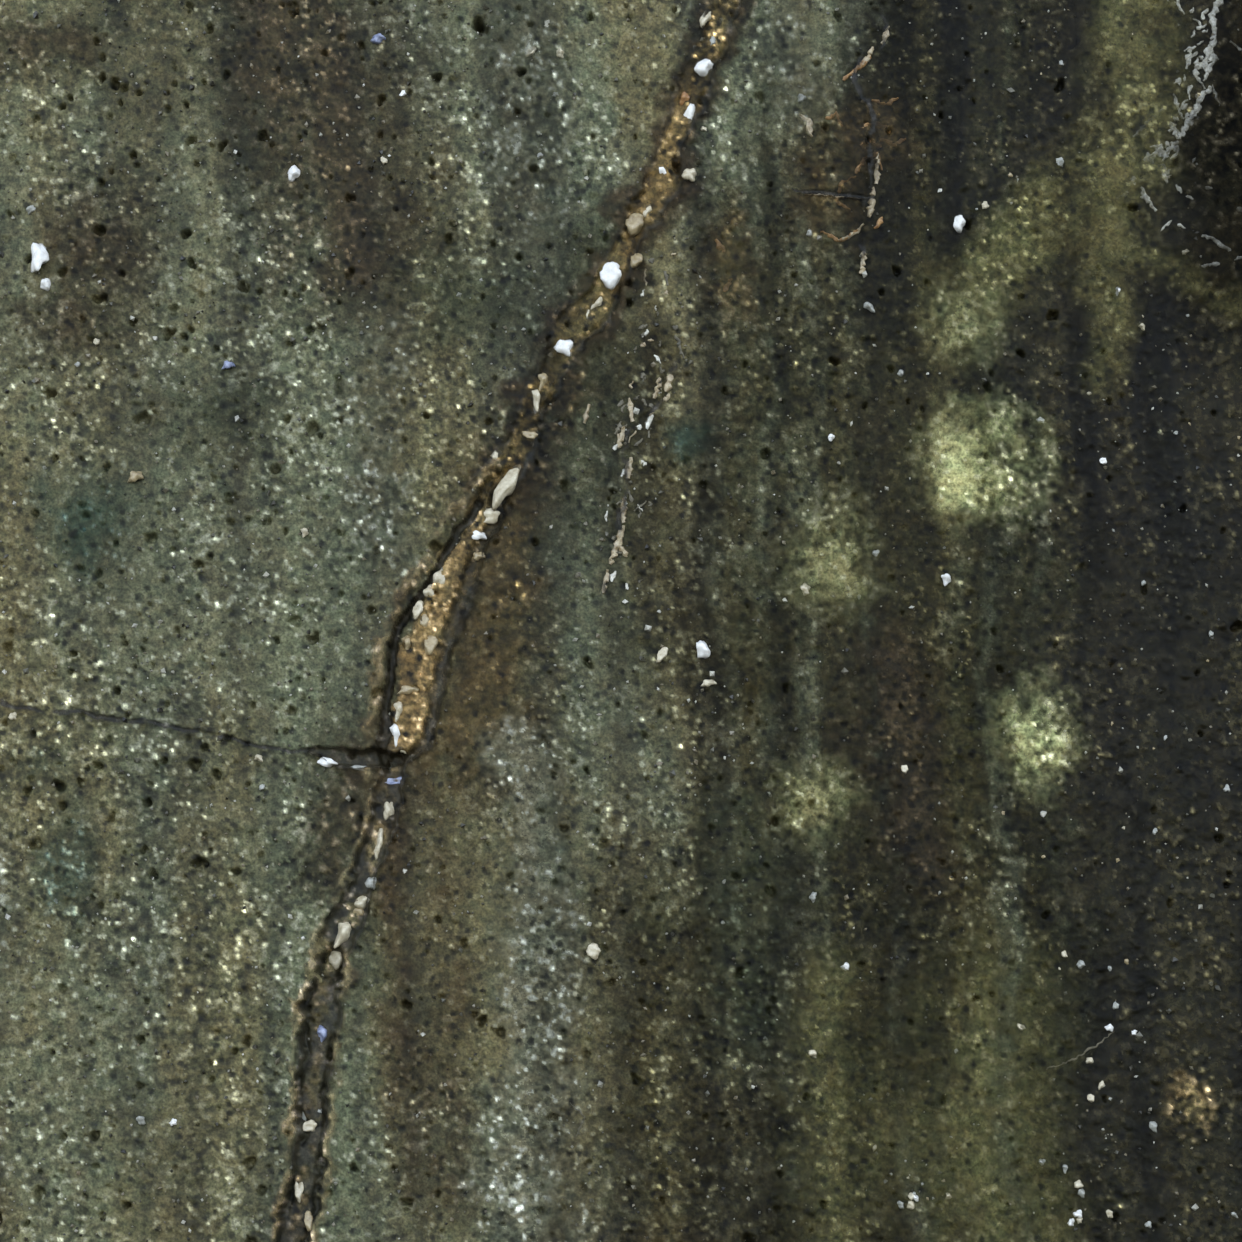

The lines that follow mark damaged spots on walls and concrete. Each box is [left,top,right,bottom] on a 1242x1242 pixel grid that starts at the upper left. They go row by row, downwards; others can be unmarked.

leakage [499,15,543,174]
crack [793,17,906,275]
crack [0,0,740,1242]
leakage [582,335,666,525]
leakage [648,0,1242,1242]
leakage [377,791,466,1170]
leakage [428,723,585,1242]
leakage [621,852,748,1242]